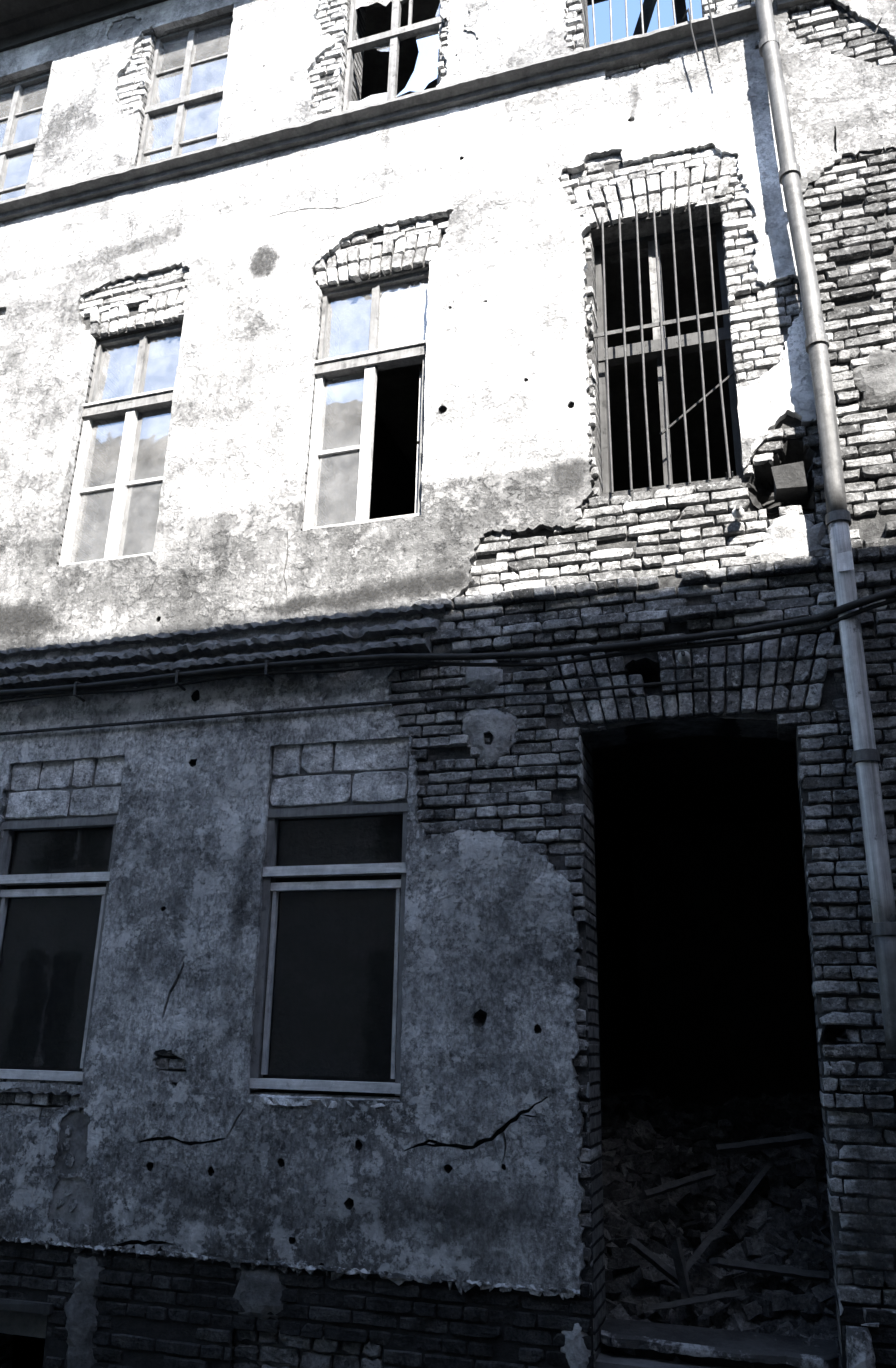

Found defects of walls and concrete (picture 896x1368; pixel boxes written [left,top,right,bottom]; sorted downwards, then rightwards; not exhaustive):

flaking render [108,18,167,140]
flaking render [308,0,365,116]
flaking render [565,0,589,51]
flaking render [701,0,755,18]
flaking render [788,1,896,66]
flaking render [314,215,450,291]
flaking render [80,267,190,339]
flaking render [385,148,896,1322]
crack [140,1123,236,1145]
crack [405,1097,548,1151]